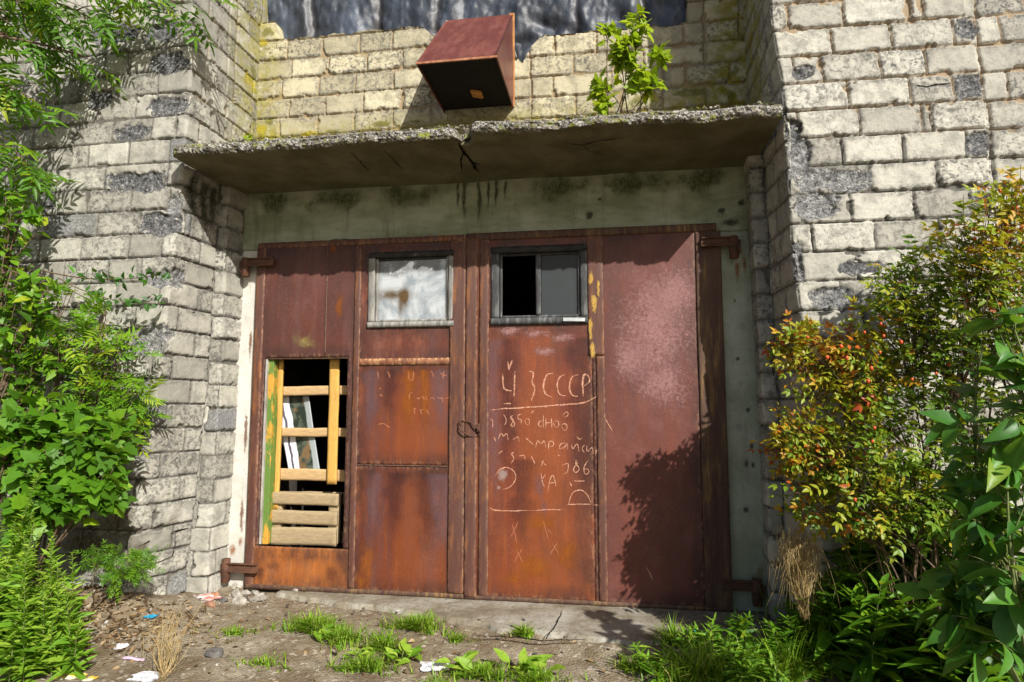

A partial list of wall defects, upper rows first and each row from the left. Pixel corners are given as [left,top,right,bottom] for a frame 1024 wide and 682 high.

spalling [952,74,984,101]
spalling [113,96,189,142]
crack [458,143,480,173]
spalling [785,118,873,221]
spalling [964,129,989,156]
spalling [103,171,183,237]
leakage [457,181,507,214]
spalling [791,241,886,311]